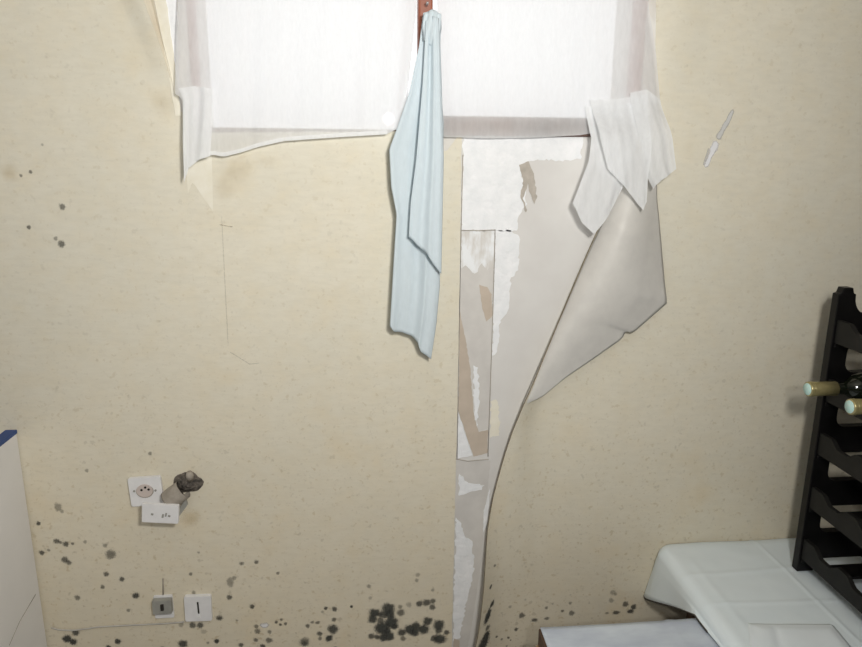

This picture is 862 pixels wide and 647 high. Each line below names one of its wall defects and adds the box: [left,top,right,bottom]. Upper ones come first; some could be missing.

spalling [166,0,177,70]
flaking render [456,137,597,647]
leakage [306,607,338,642]
leakage [369,599,449,644]
leakage [479,600,518,647]